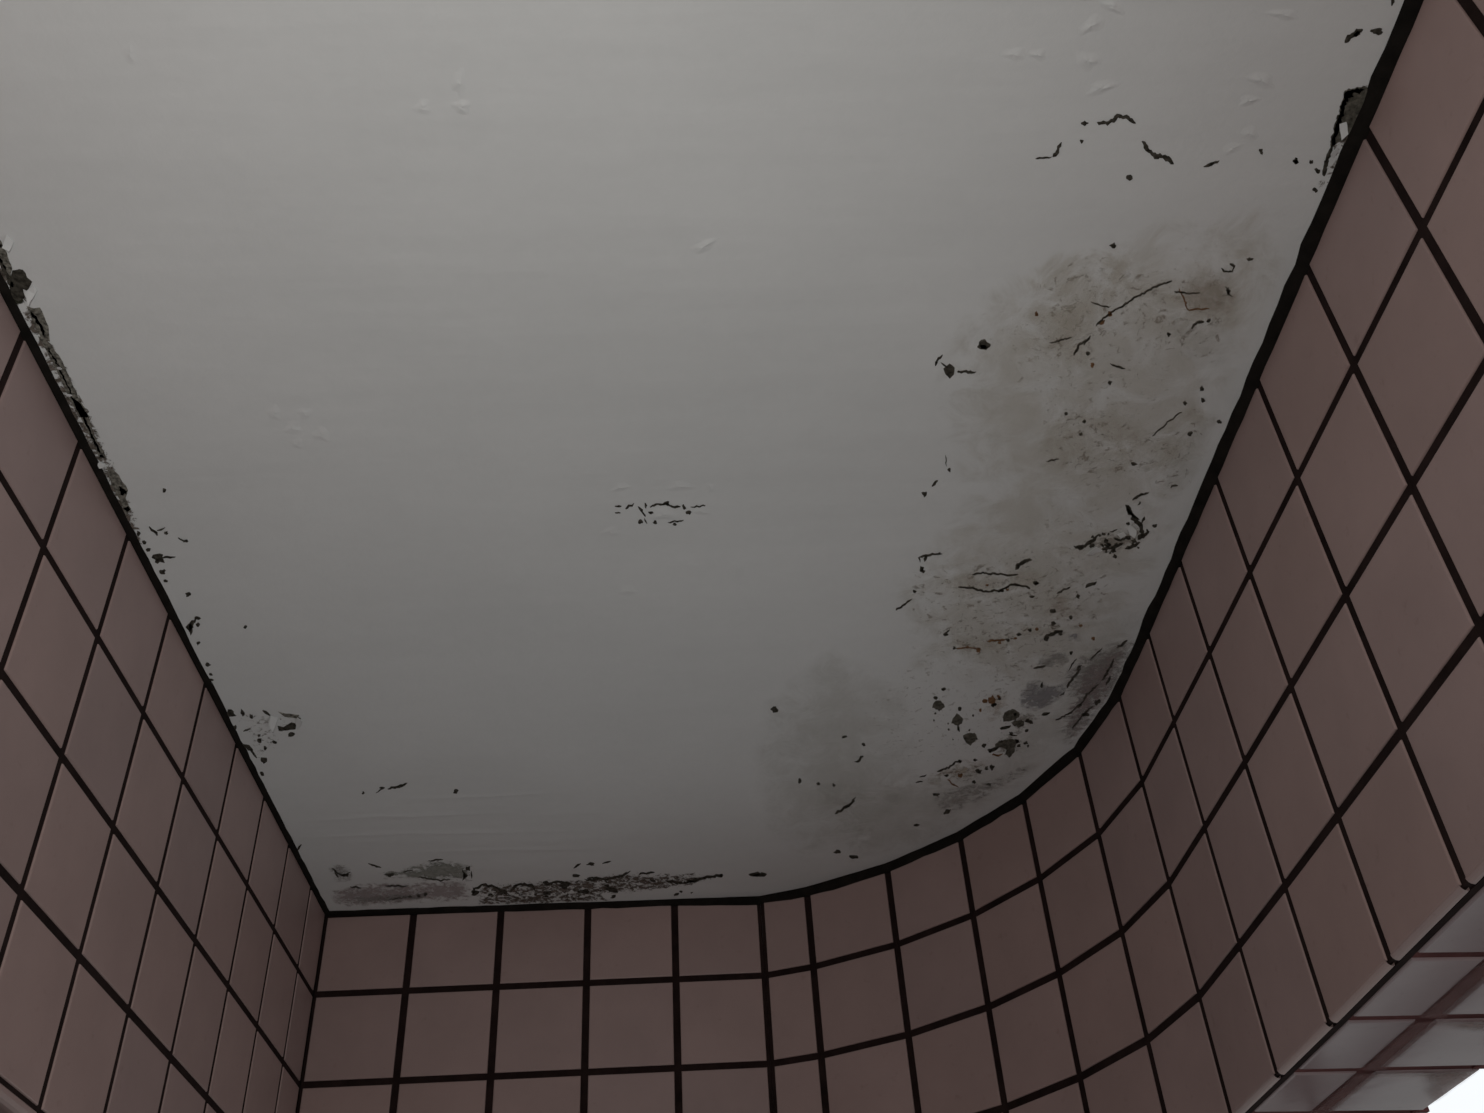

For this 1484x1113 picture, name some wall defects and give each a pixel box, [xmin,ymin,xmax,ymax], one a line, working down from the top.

spalling [0,236,141,544]
damp [1152,386,1205,436]
damp [932,634,1128,758]
spalling [227,709,302,776]
spalling [471,861,723,904]